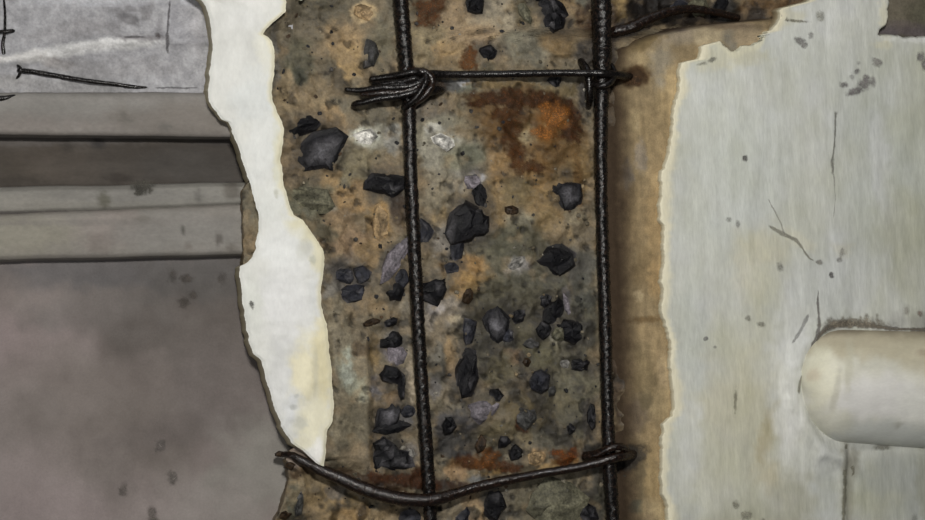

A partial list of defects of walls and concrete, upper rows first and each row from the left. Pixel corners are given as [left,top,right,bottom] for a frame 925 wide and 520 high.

spalling [878,0,925,37]
corrosion [467,87,582,175]
crack [829,113,837,185]
spalling [196,0,424,520]
spalling [409,0,607,520]
flaking render [607,0,802,520]
crack [770,203,812,260]
corrosion [367,467,423,489]
corrosion [456,449,523,473]
crack [842,445,854,520]